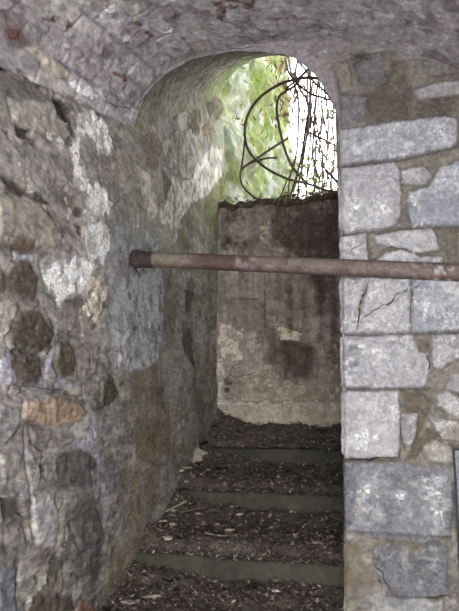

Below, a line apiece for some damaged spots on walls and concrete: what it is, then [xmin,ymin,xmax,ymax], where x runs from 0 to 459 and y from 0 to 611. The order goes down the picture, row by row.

water stain [255,204,340,259]
water stain [309,275,336,335]
crack [357,279,417,327]